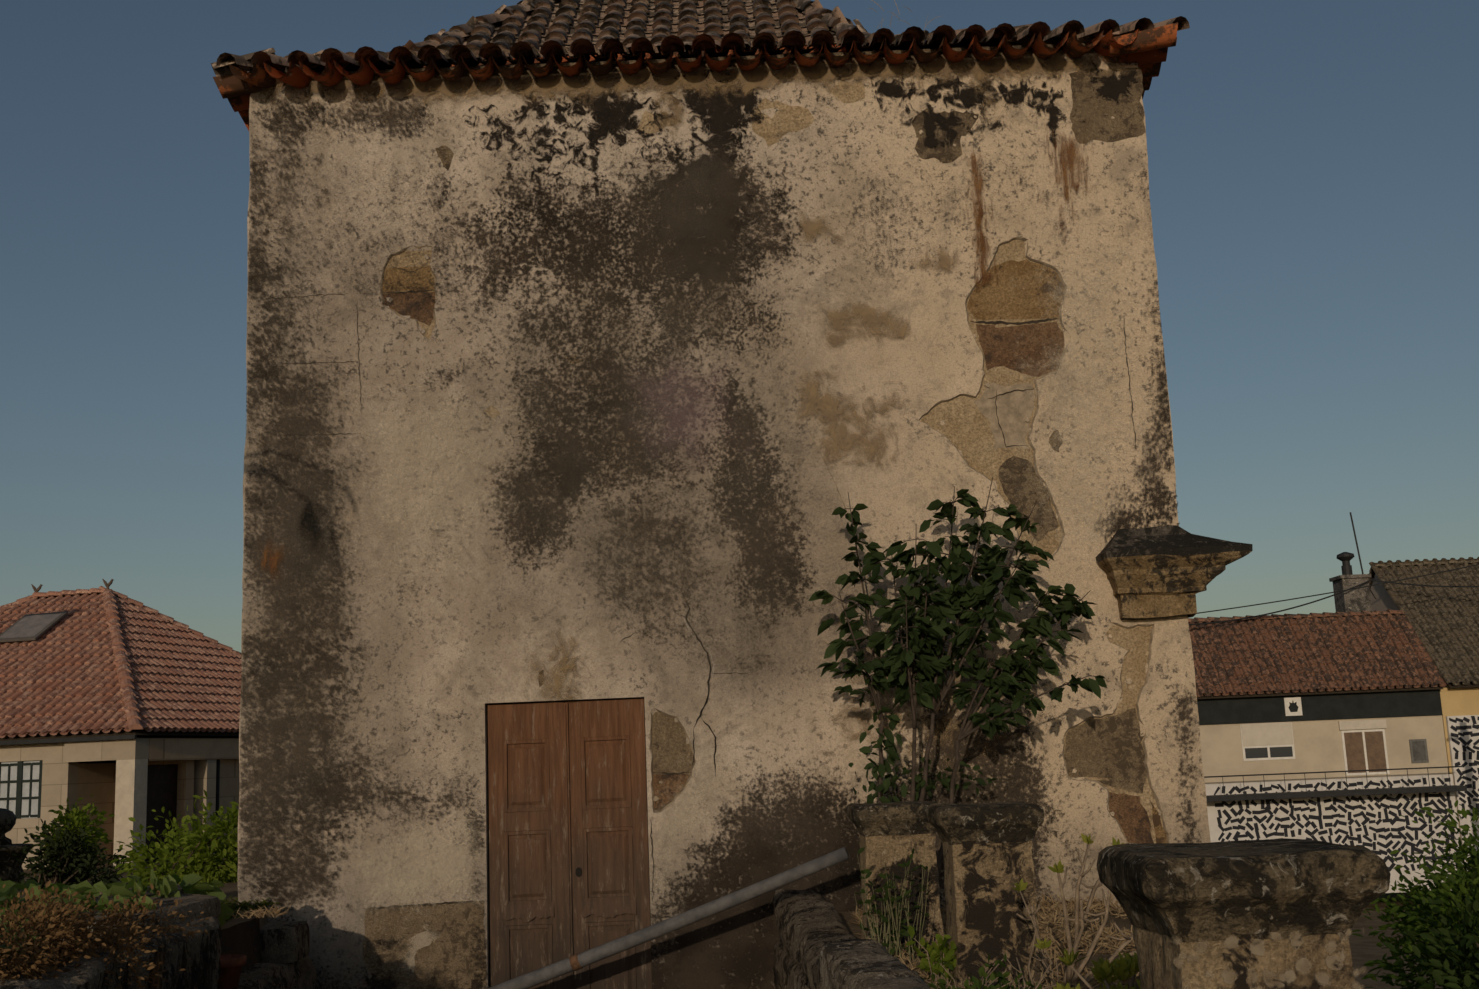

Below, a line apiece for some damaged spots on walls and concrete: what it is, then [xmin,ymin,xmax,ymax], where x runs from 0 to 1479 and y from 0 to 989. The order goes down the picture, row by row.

spalling [1069,61,1146,144]
spalling [366,233,450,353]
spalling [905,224,1084,579]
water stain [238,52,1122,989]
spalling [645,694,710,827]
crack [684,578,754,776]
spalling [1049,609,1184,844]